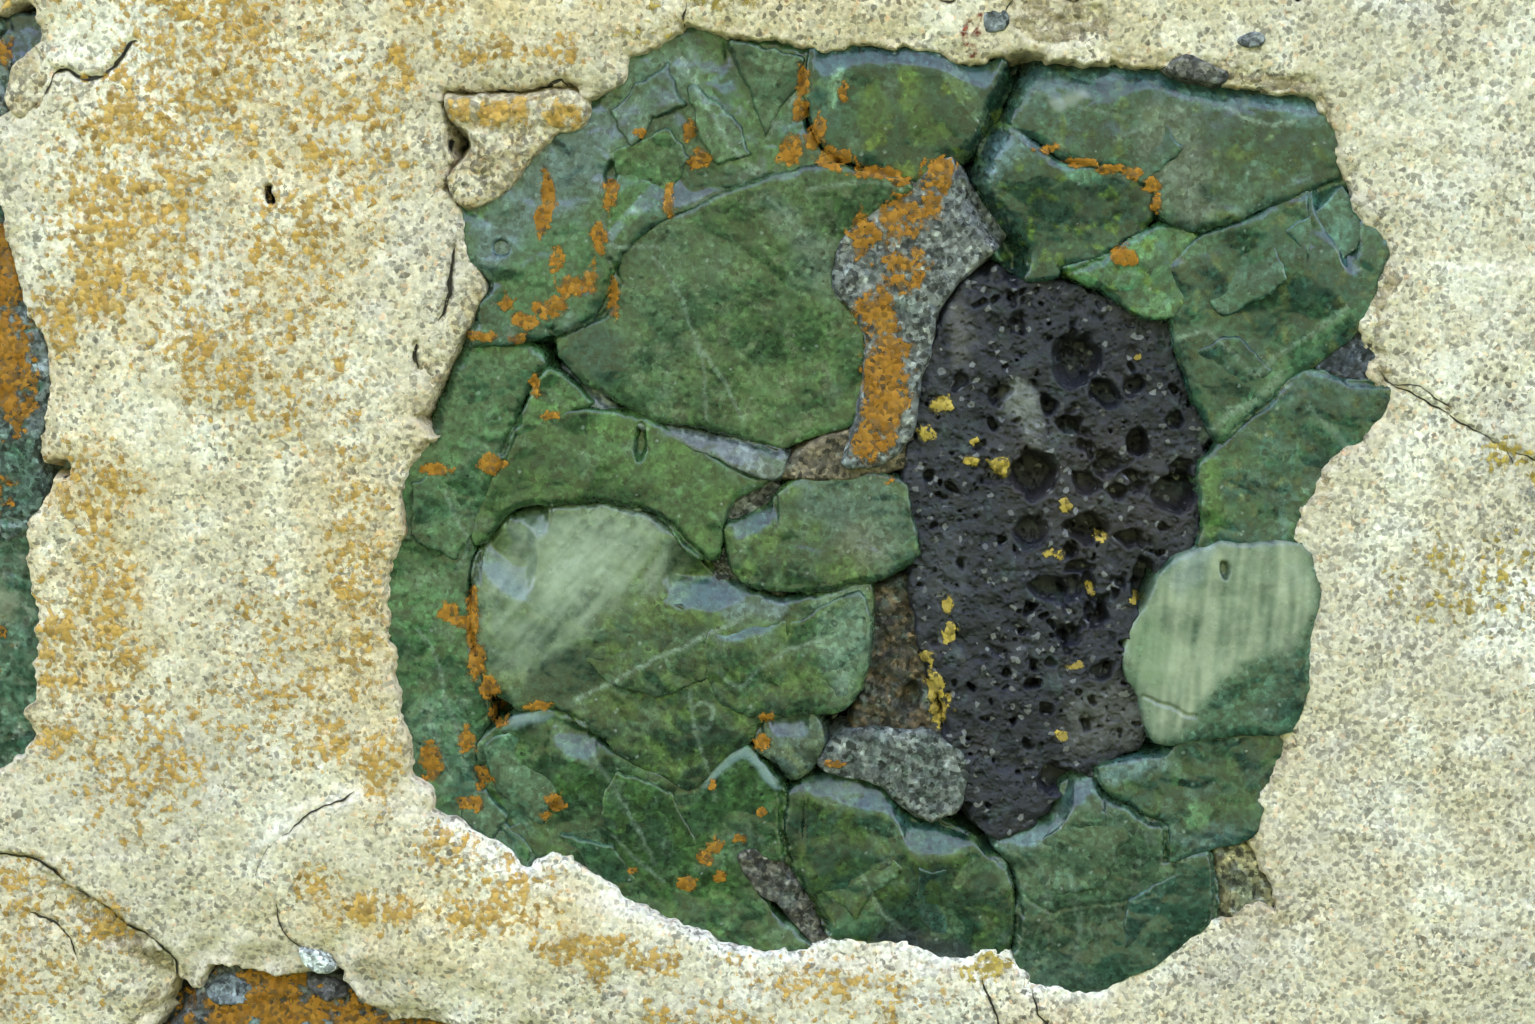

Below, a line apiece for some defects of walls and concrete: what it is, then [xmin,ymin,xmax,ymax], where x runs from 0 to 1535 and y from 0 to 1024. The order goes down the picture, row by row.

peeling [1,10,42,66]
spalling [1237,31,1265,48]
spalling [1159,54,1329,117]
spalling [1369,264,1398,401]
peeling [817,715,969,823]
crack [0,853,178,974]
peeling [1212,842,1275,918]